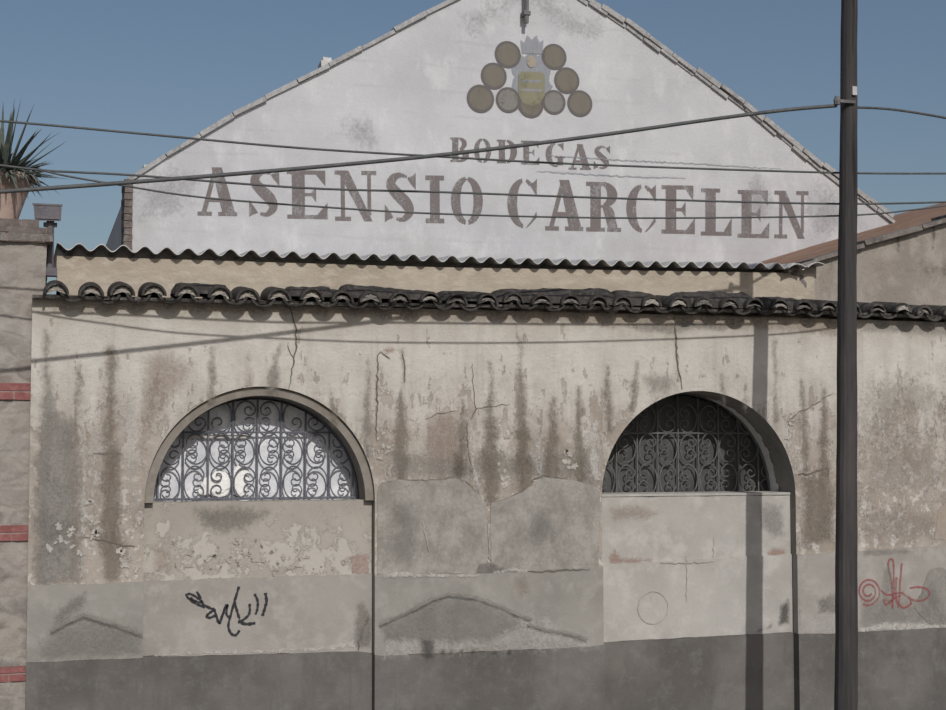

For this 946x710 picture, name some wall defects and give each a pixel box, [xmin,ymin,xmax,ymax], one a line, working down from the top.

damp [34,369,80,583]
flaking render [46,410,100,578]
damp [101,348,123,578]
crack [287,306,298,389]
crack [375,351,406,439]
damp [395,393,407,480]
crack [382,364,583,561]
damp [481,394,499,503]
damp [514,369,531,492]
crack [674,313,682,387]
damp [802,410,832,544]
flaking render [174,536,369,580]